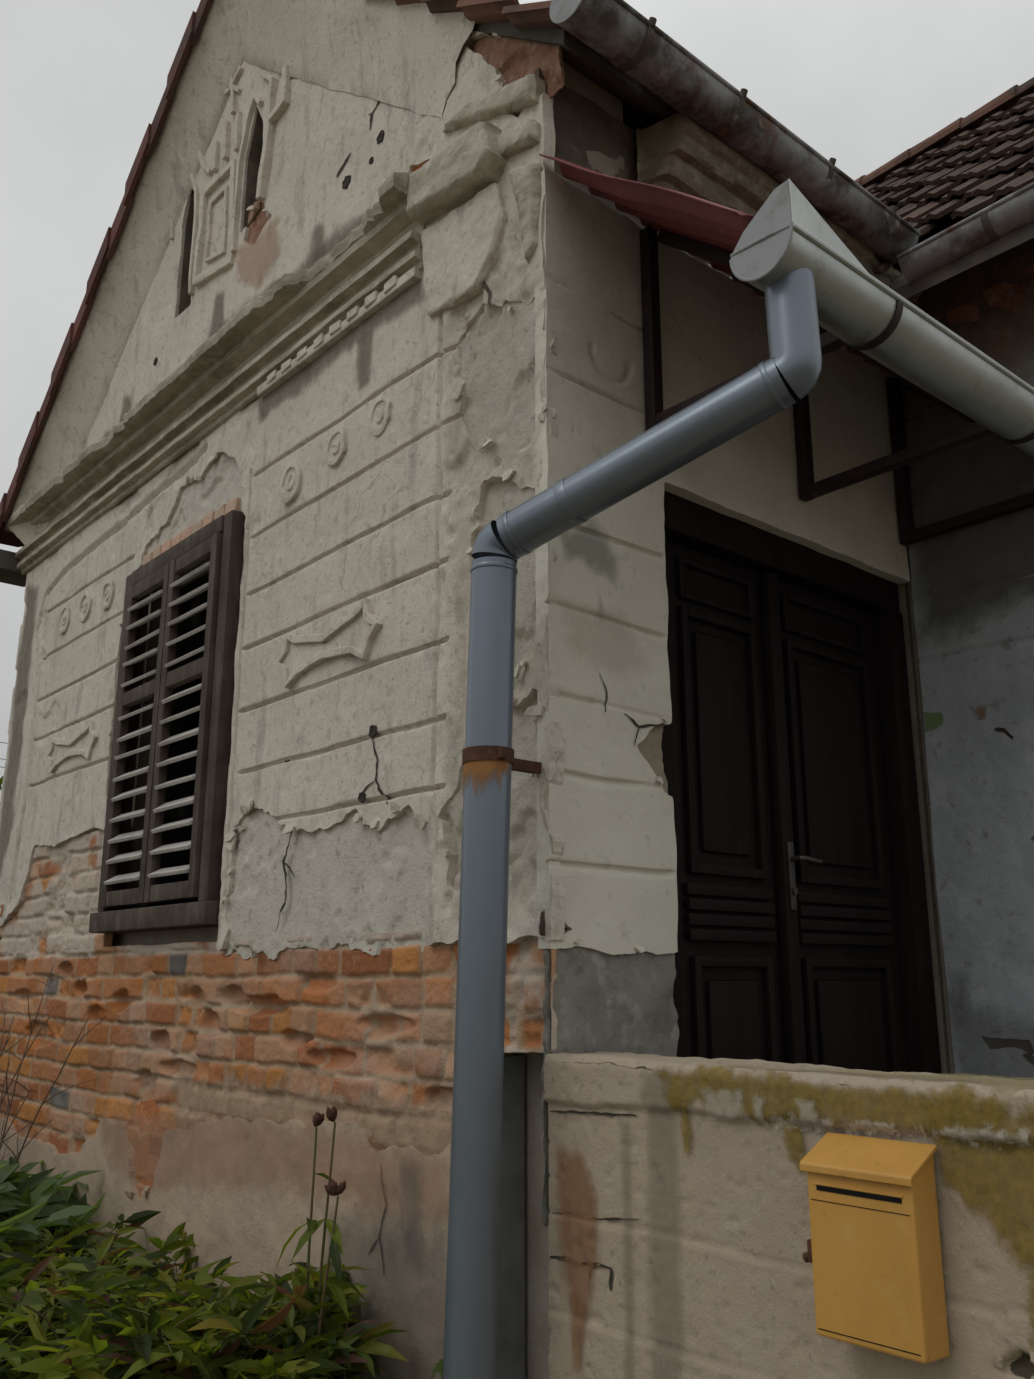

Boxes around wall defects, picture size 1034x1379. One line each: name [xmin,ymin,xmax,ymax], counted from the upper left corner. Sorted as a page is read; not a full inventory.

flaking render [466,35,565,99]
leakage [301,217,363,269]
leakage [209,293,226,338]
leakage [120,397,129,422]
crack [599,673,665,746]
crack [362,740,391,805]
rust [463,760,509,789]
flaking render [637,717,668,794]
flaking render [0,774,464,1198]
leakage [706,1090,1031,1146]
rust [559,1153,595,1368]